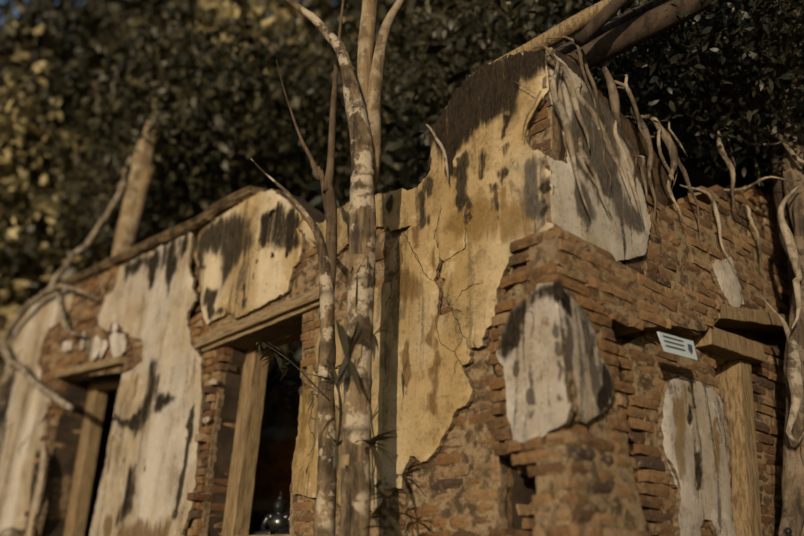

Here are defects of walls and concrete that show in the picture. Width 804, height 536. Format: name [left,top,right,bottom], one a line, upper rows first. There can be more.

damp [427,48,545,224]
damp [124,202,299,319]
crack [403,228,466,283]
flaking render [620,184,789,314]
flaking render [34,265,143,536]
damp [116,463,136,524]
damp [114,360,174,438]
damp [171,406,194,518]
flaking render [185,232,320,536]
crack [435,282,483,373]
flaking render [370,282,734,536]
flaking render [747,328,786,536]